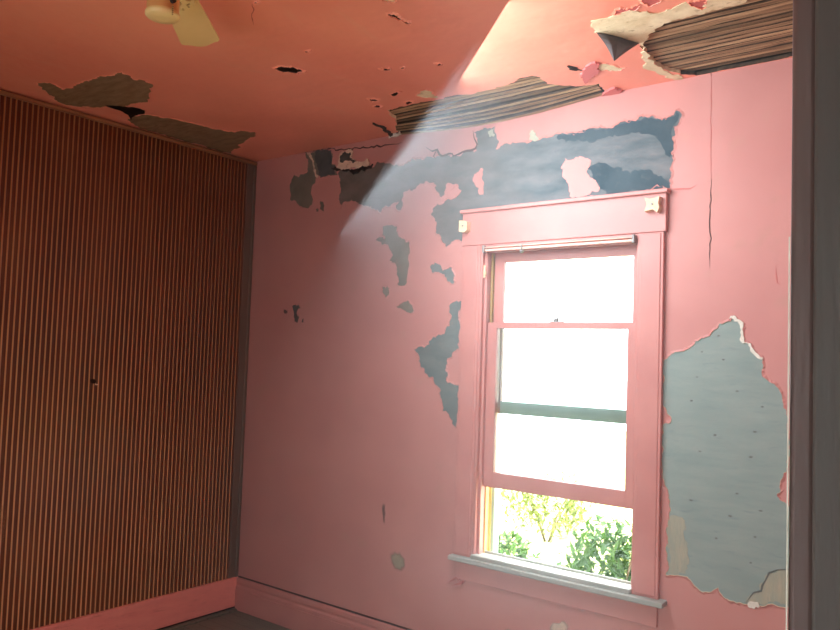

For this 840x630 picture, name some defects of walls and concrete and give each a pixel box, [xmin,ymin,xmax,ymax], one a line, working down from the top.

peeling [611,0,663,15]
peeling [686,0,707,10]
peeling [35,71,258,154]
spalling [695,52,791,106]
peeling [289,108,685,249]
crack [673,180,712,260]
peeling [375,223,412,299]
peeling [429,260,457,286]
peeling [413,299,461,429]
peeling [661,237,790,630]